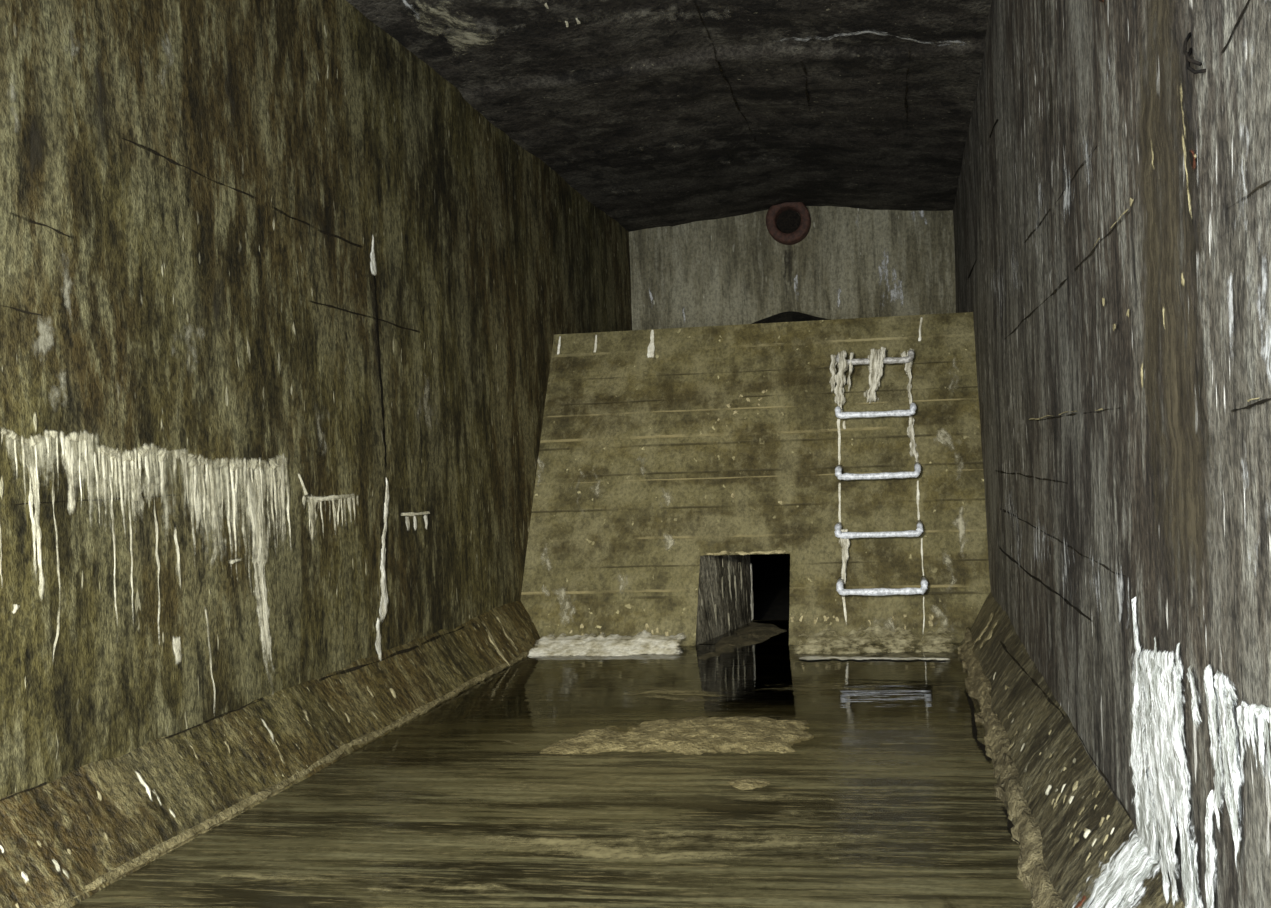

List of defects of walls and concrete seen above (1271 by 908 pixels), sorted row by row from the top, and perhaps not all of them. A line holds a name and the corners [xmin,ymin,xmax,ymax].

crack [1221,0,1249,53]
crack [122,138,363,247]
crack [1233,180,1271,205]
crack [7,306,42,316]
damp [38,320,53,353]
crack [310,275,419,582]
damp [830,347,886,465]
damp [901,317,923,462]
damp [1,429,358,672]
damp [375,478,430,661]
damp [790,483,953,660]
damp [205,610,216,707]